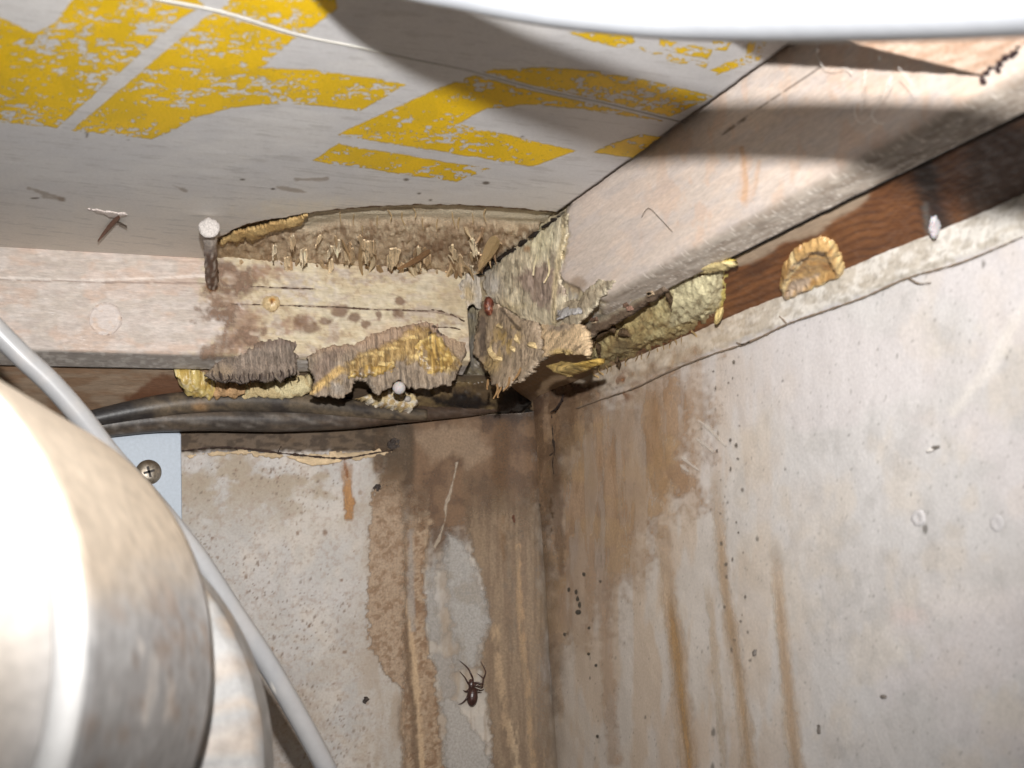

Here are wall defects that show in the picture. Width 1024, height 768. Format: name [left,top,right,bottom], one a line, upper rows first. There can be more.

damp [200,263,266,359]
peeling [487,334,537,362]
rust [343,467,355,520]
damp [374,363,703,619]